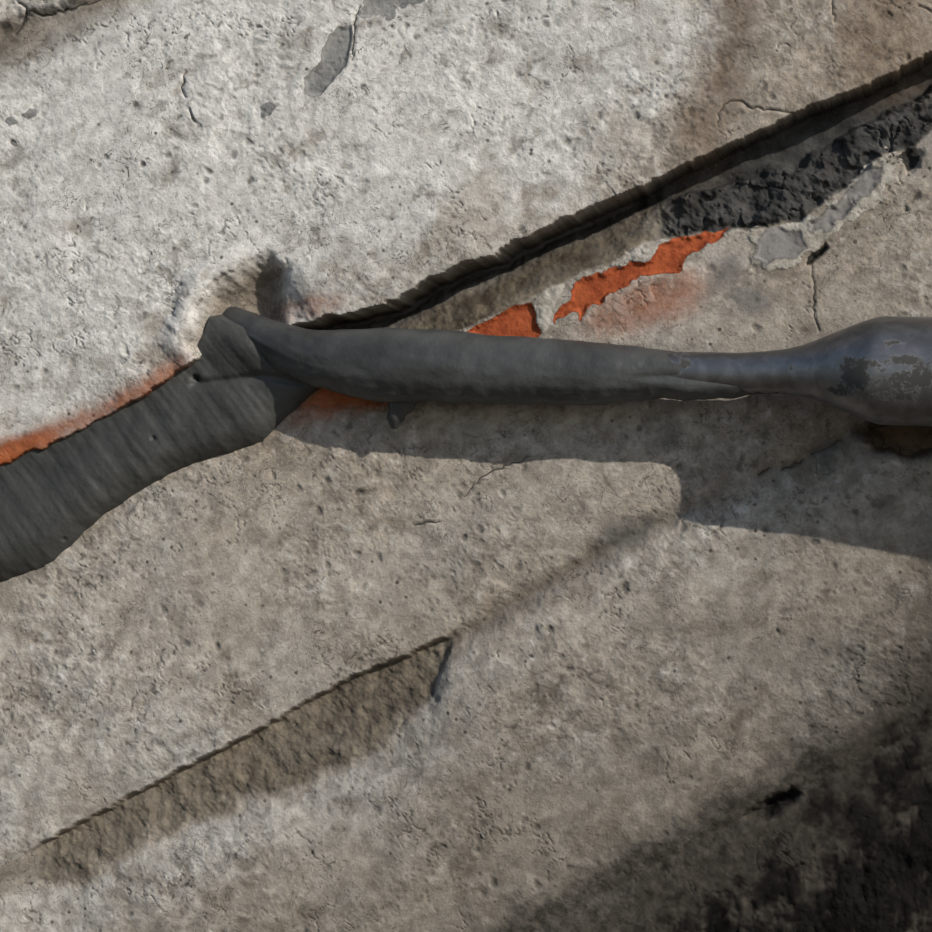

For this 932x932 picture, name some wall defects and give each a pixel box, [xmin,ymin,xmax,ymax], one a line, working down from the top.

peeling [358,0,425,20]
peeling [304,25,353,97]
peeling [261,102,277,117]
crack [717,100,788,123]
spalling [747,146,920,274]
spalling [467,227,729,338]
crack [811,266,819,329]
leakage [669,644,932,932]